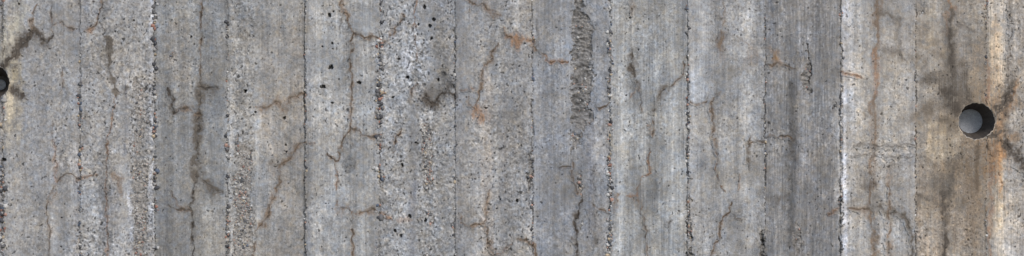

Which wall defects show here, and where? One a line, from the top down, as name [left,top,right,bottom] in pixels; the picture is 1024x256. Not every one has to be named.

crack [44,94,117,256]
crack [251,0,570,256]
crack [592,0,796,256]
leakage [876,0,1024,256]